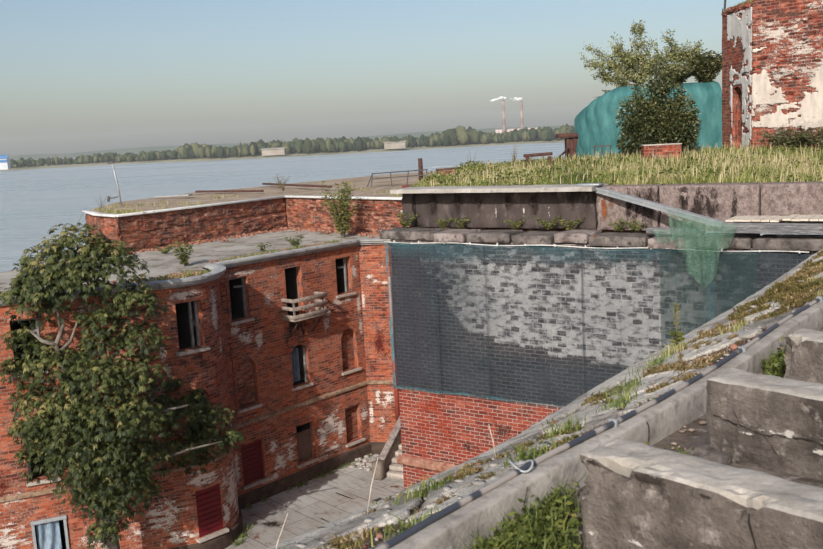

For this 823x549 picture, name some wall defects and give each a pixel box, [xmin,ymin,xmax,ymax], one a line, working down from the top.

peeling [727,0,823,150]
peeling [316,409,346,459]
peeling [258,438,296,485]
peeling [126,453,241,546]
peeling [0,517,32,549]